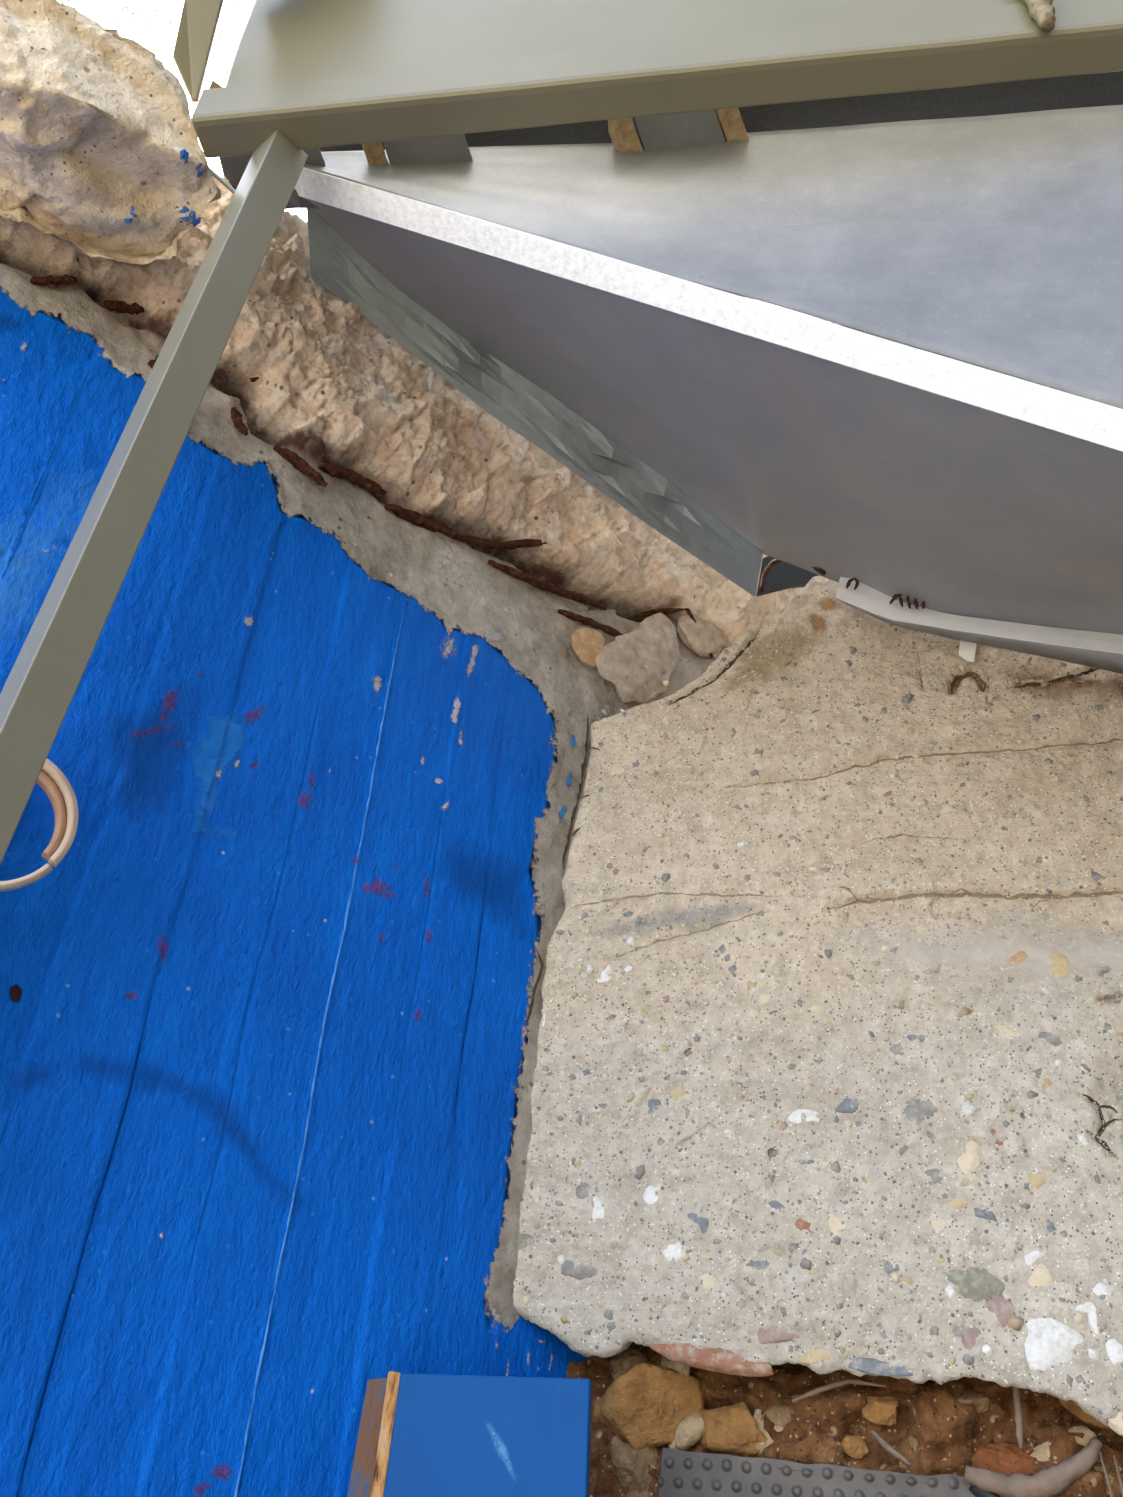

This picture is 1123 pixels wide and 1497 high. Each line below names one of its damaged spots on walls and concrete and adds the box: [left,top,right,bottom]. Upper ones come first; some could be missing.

spalling [0,177,234,382]
spalling [188,211,1123,1396]
crack [561,714,772,959]
crack [730,738,1123,788]
crack [830,886,1123,909]
spalling [1107,1412,1123,1436]